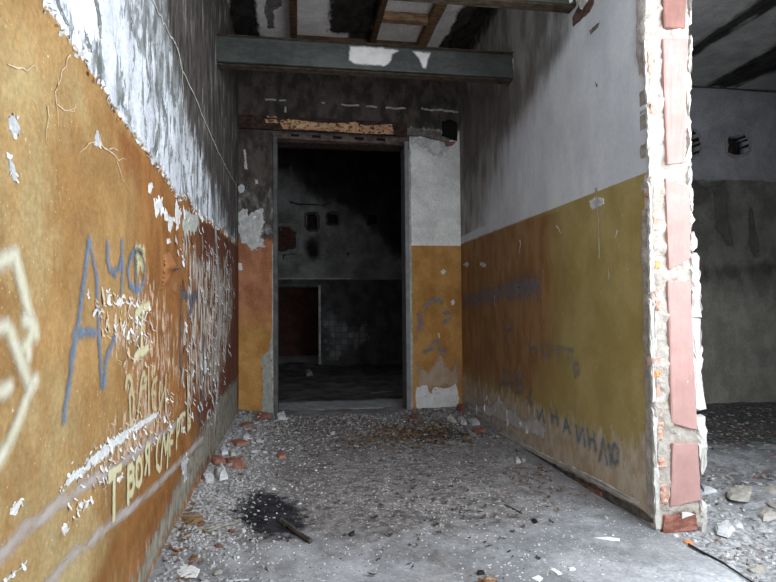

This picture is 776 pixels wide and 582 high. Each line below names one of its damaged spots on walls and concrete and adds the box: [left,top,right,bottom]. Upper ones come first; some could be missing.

peeling [264,0,282,29]
spalling [569,0,594,27]
crack [32,54,76,140]
spalling [8,112,21,140]
spalling [6,152,19,183]
crack [83,142,126,180]
peeling [43,0,266,426]
leakage [691,180,732,245]